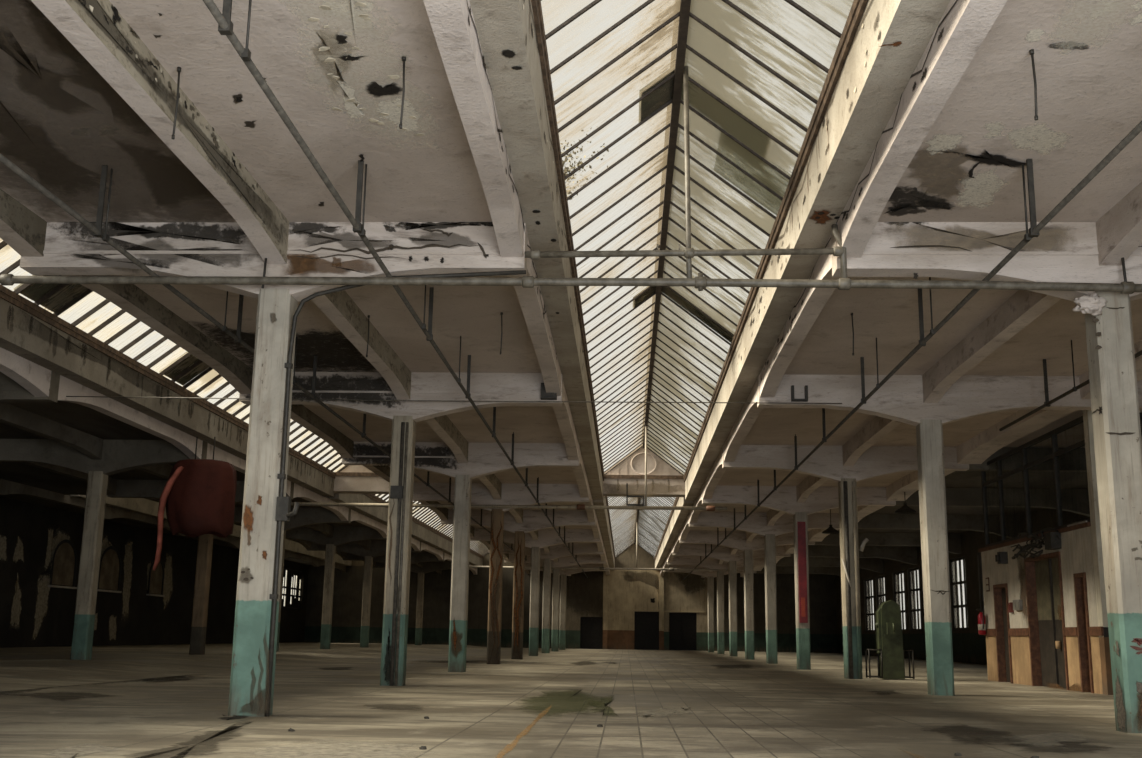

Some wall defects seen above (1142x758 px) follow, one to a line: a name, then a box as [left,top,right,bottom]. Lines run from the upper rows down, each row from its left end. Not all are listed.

peeling [83,0,220,148]
peeling [836,0,966,224]
spalling [931,150,1026,178]
crack [295,228,489,263]
peeling [0,528,70,640]
peeling [94,535,133,641]